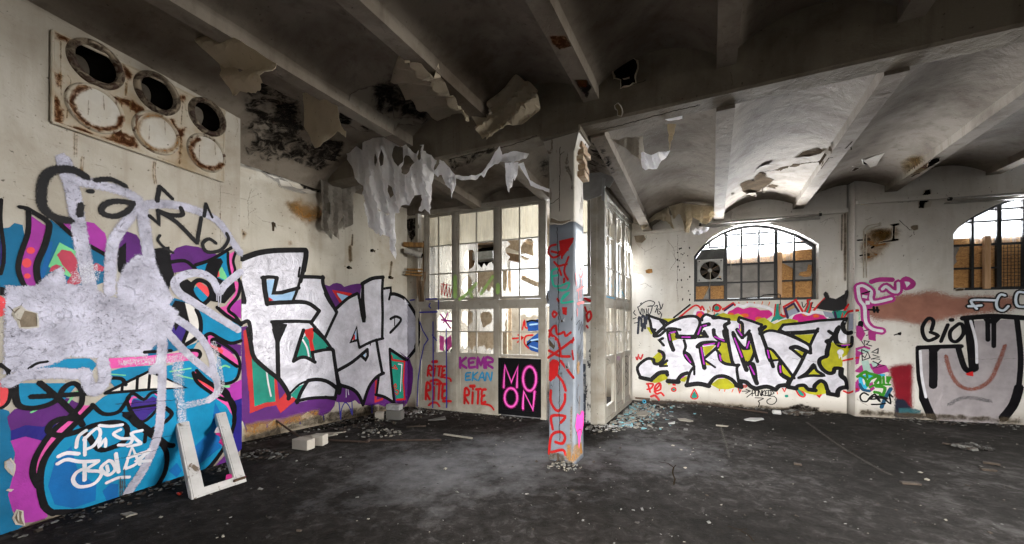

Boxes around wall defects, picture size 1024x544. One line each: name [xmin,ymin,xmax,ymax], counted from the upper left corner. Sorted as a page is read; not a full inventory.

rust [54,66,225,184]
leakage [245,83,344,177]
peeling [262,56,549,259]
flaking render [577,141,591,183]
peeling [611,116,682,170]
peeling [634,203,715,248]